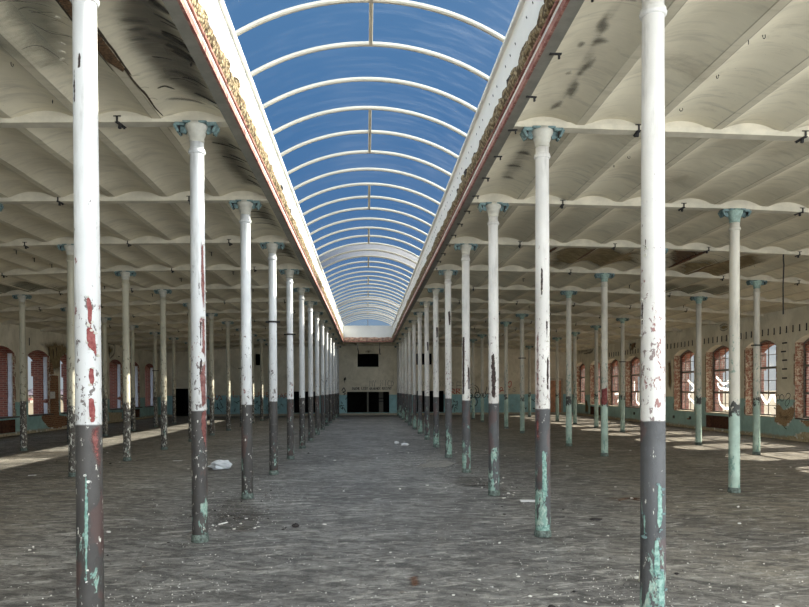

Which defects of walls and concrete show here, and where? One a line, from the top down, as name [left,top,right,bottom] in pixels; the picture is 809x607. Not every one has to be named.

water stain [124,0,220,110]
peeling [198,244,208,452]
peeling [536,319,549,438]
flaking render [666,358,728,433]
flaking render [740,347,809,443]
peeling [83,474,91,583]
peeling [641,483,668,607]